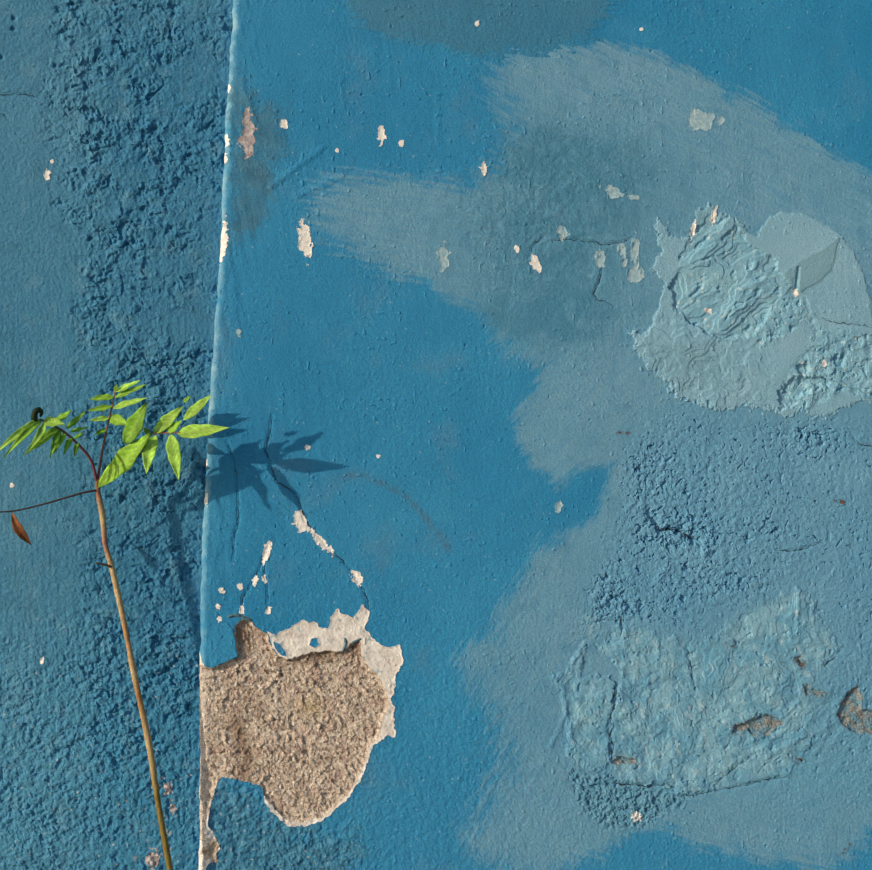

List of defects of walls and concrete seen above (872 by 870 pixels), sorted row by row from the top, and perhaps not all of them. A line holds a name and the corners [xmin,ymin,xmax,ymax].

peeling [224,106,258,164]
peeling [688,109,726,131]
peeling [296,218,314,265]
crack [529,239,629,255]
crack [265,419,368,604]
peeling [237,541,272,590]
peeling [349,570,363,587]
flaking render [550,588,843,832]
flaking render [836,684,872,734]
spalling [198,603,404,870]